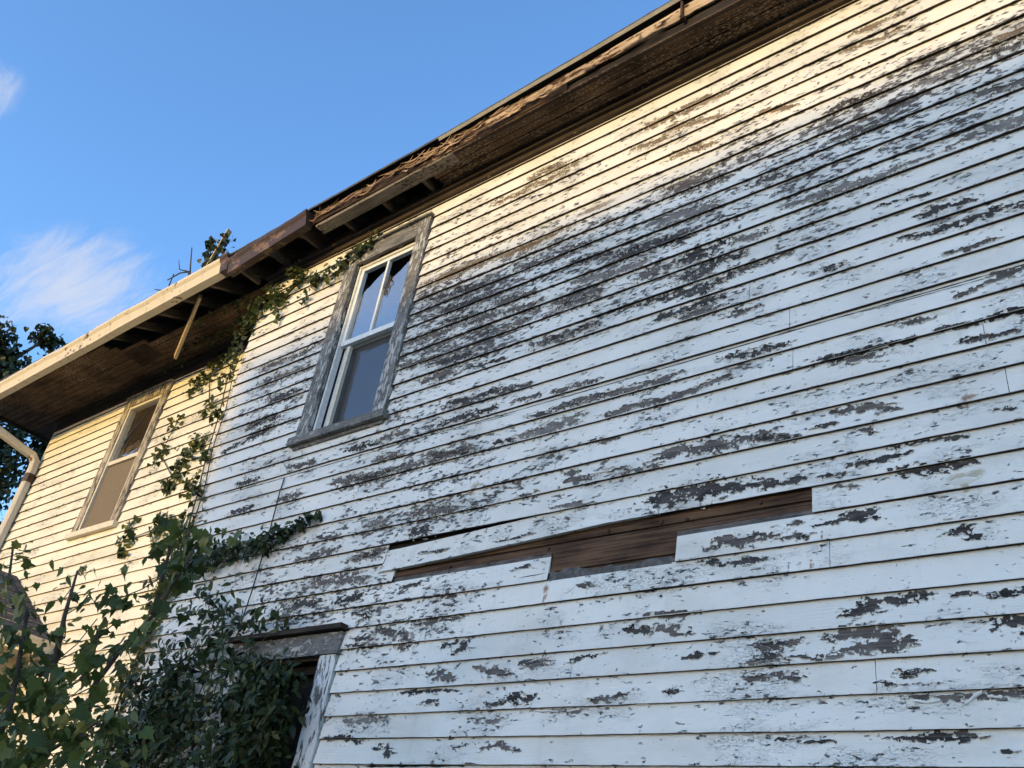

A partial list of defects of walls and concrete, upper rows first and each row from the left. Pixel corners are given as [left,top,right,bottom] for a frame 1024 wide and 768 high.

peeling [871,190,1024,247]
peeling [396,162,796,388]
peeling [803,306,1024,370]
peeling [220,344,320,455]
peeling [327,339,798,495]
peeling [515,400,981,514]
peeling [697,507,887,568]
peeling [622,609,703,638]
peeling [740,585,1024,704]
peeling [397,668,460,707]
peeling [472,651,630,725]
peeling [863,723,991,750]